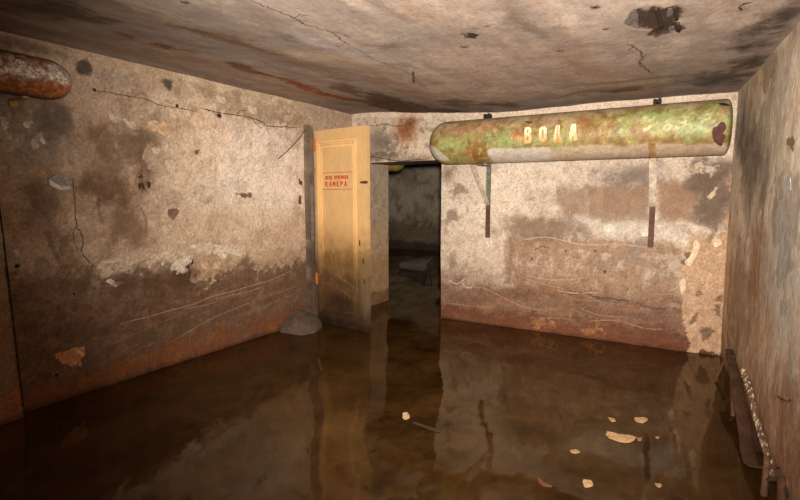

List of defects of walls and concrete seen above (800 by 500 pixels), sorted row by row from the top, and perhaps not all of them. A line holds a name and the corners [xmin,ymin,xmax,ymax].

spalling [624,6,686,37]
water stain [748,7,800,35]
crack [626,43,650,73]
rust [281,78,390,107]
crack [95,91,298,134]
rust [712,122,726,146]
crack [72,178,106,284]
water stain [90,233,302,321]
flaking render [678,204,729,355]
rust [531,317,557,330]
flaking render [55,346,85,366]